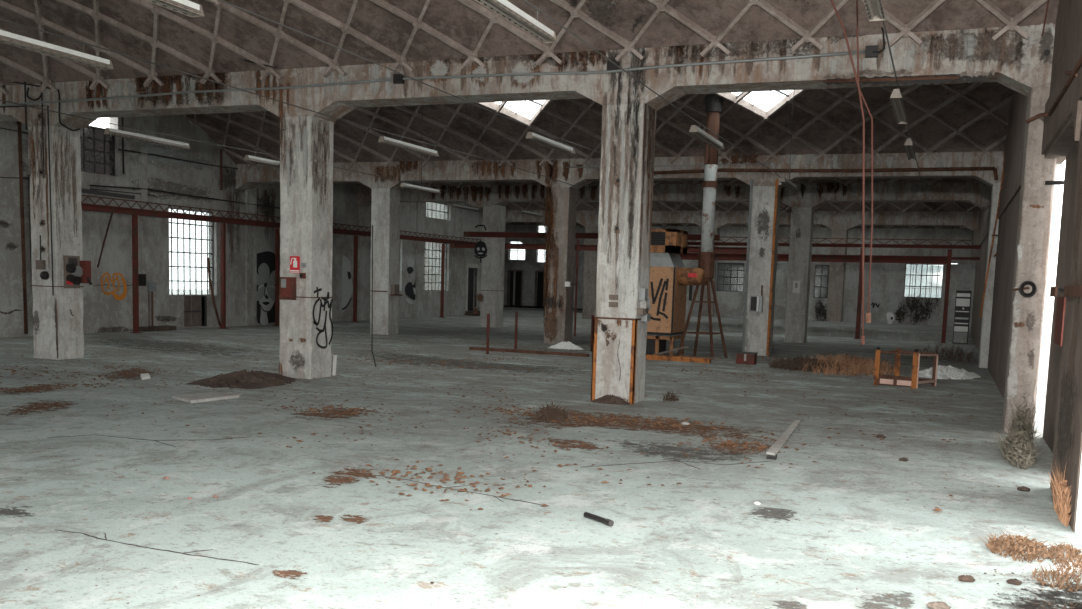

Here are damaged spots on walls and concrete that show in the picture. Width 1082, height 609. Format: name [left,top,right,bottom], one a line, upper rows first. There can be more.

water stain [22,115,77,246]
rust [134,73,225,107]
rust [374,161,418,183]
rust [431,160,597,321]
water stain [369,38,837,266]
water stain [854,27,1026,73]
water stain [1038,23,1055,64]
water stain [1007,285,1021,417]